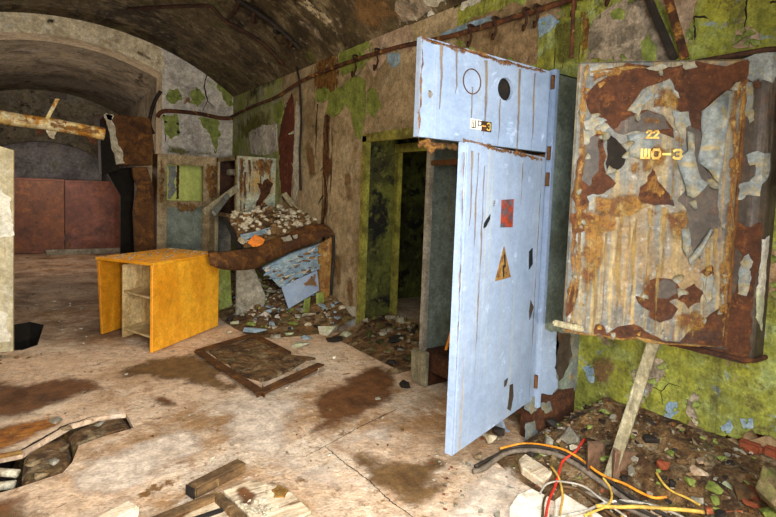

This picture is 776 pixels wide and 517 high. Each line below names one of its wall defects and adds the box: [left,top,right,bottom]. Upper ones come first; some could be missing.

peeling [357,0,446,77]
peeling [441,0,565,67]
leakage [0,377,101,416]
leakage [312,367,395,431]
spalling [718,418,776,459]
leakage [354,452,444,505]